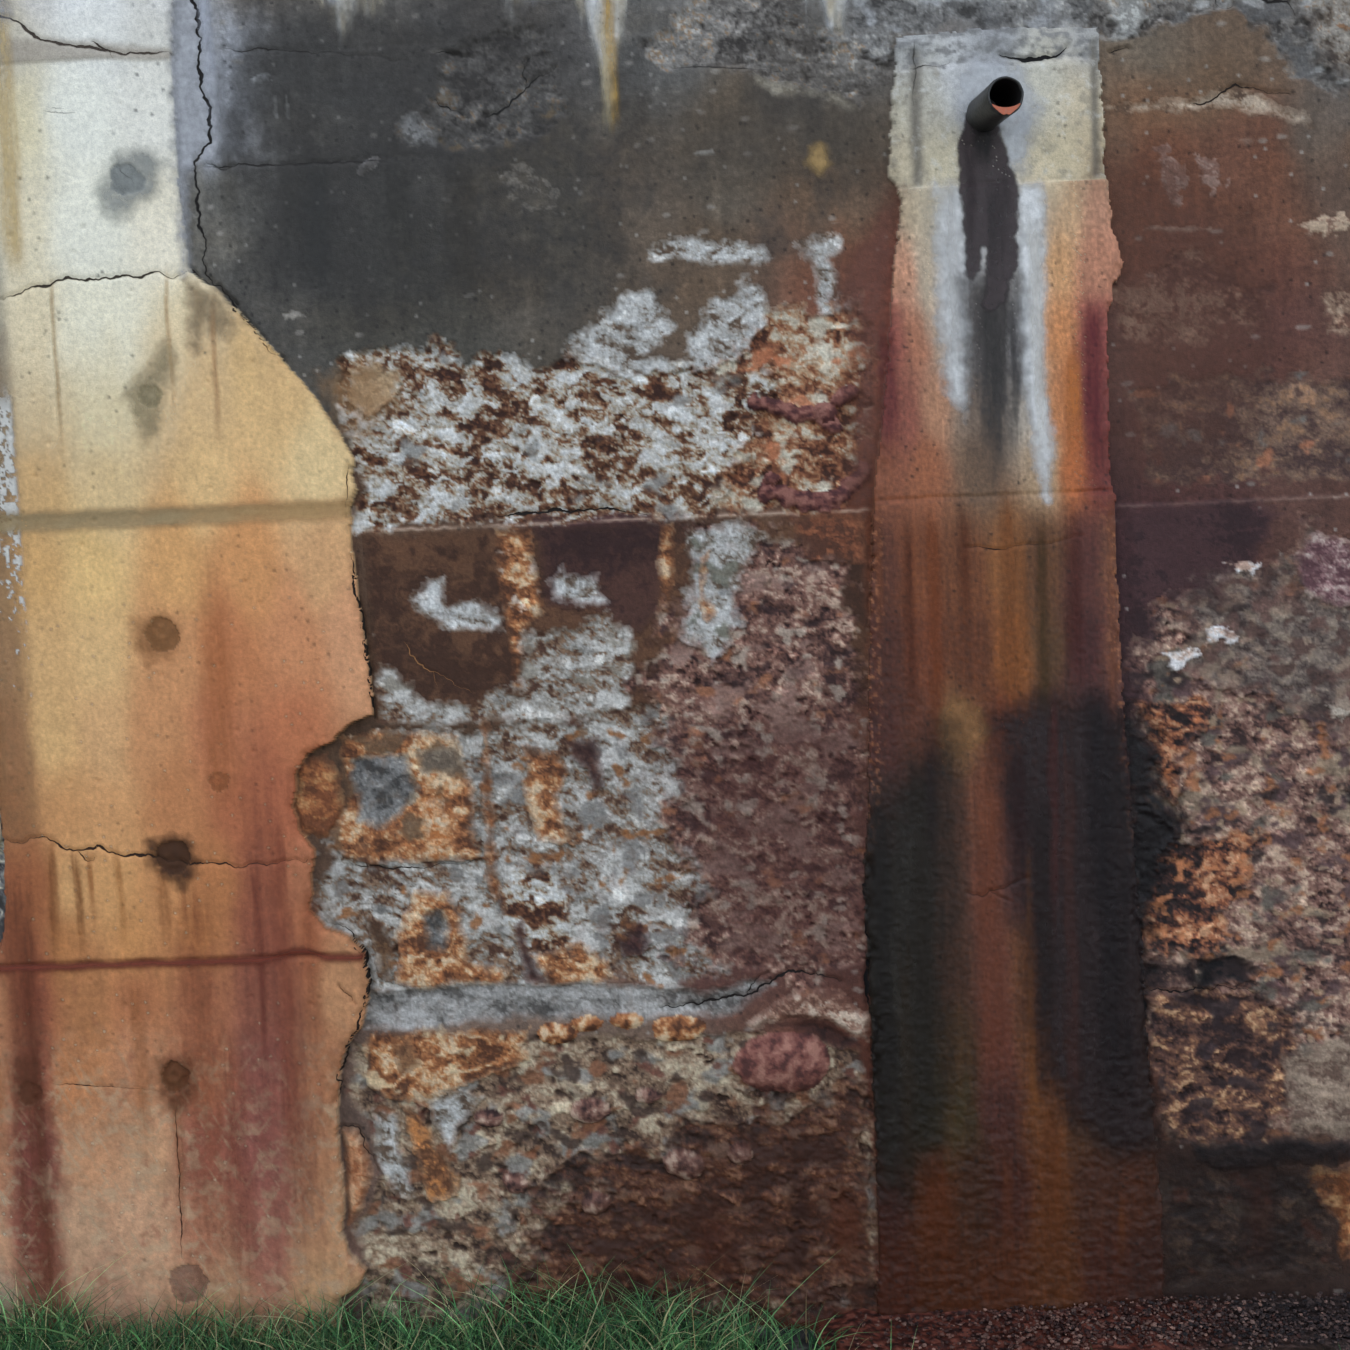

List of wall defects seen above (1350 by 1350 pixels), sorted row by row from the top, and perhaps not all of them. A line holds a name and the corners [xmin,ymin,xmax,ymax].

damp [170,0,221,239]
crack [0,0,401,362]
spalling [394,14,572,215]
damp [576,0,627,120]
damp [926,62,1053,503]
spalling [1116,362,1350,494]
peeling [1297,211,1350,239]
crack [1,822,308,868]
rust [0,319,373,1344]
rust [863,179,1165,1316]
damp [994,703,1189,1149]
spalling [1120,508,1350,1261]